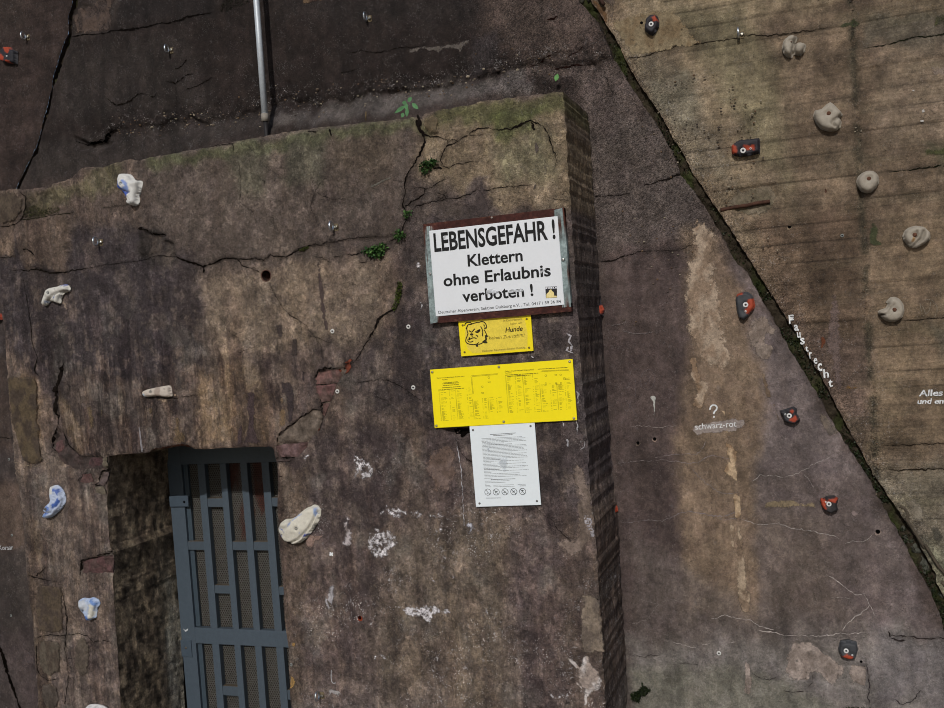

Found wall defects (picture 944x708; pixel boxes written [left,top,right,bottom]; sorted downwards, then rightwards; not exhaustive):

crack [0,114,556,486]
spalling [276,359,352,462]
spalling [55,432,110,495]
efflorescence [368,529,397,558]
efflorescence [403,606,450,622]
crack [0,647,21,708]
efflorescence [568,656,600,706]